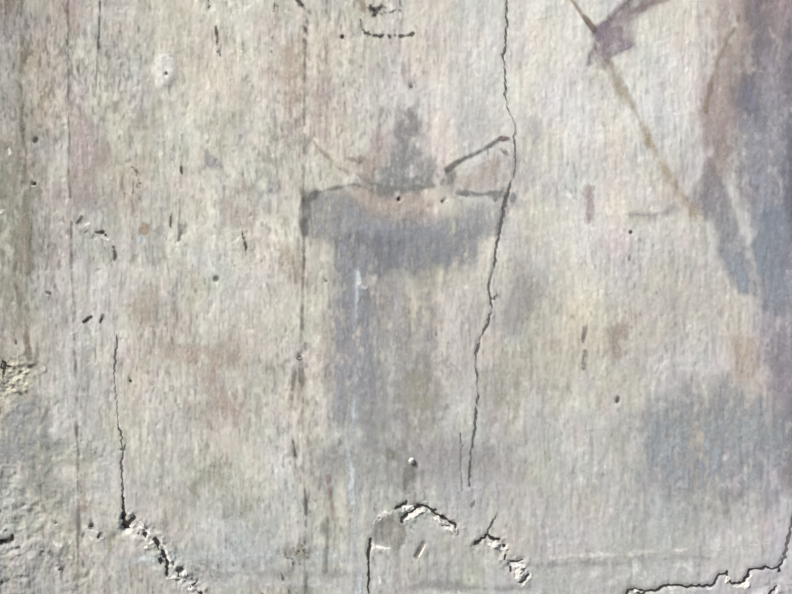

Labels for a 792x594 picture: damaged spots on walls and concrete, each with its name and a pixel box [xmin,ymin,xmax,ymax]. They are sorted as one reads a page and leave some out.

crack [459,0,516,507]
crack [113,334,203,594]
crack [366,500,532,593]
crack [625,517,792,594]
spalling [745,582,792,594]